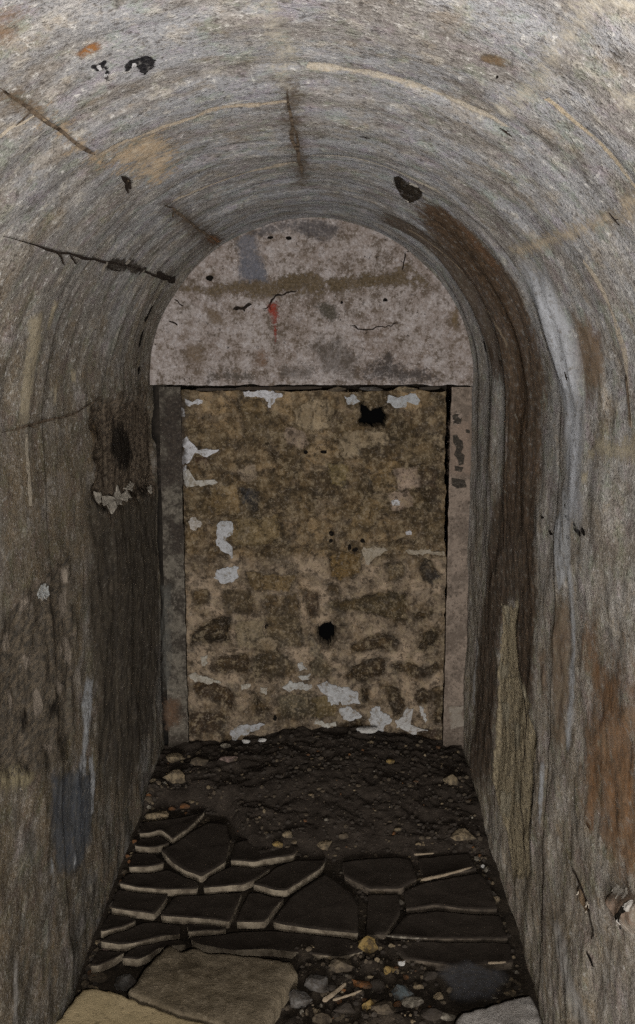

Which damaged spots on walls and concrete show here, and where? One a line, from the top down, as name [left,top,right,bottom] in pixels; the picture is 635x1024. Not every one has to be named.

spalling [91,60,109,82]
spalling [125,56,156,75]
crack [0,88,95,155]
crack [287,91,303,174]
spalling [394,176,425,203]
crack [3,236,183,325]
spalling [88,387,157,525]
peeling [327,694,362,721]
crack [571,866,594,940]